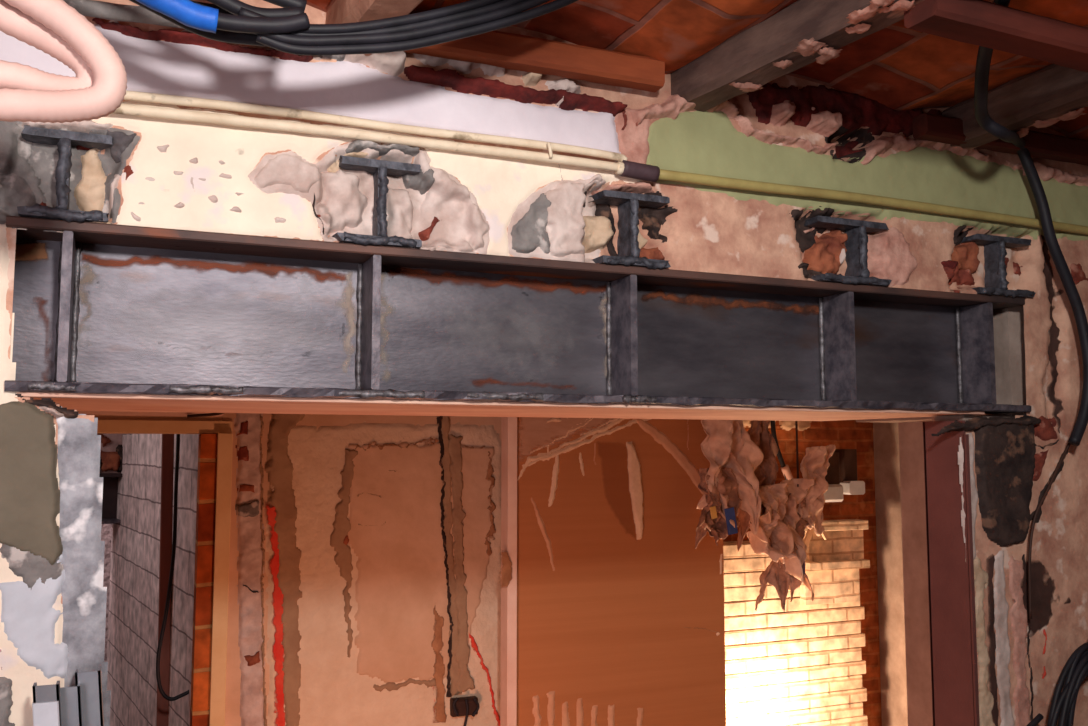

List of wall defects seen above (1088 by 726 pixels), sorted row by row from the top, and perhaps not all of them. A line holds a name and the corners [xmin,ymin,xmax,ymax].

flaking render [92,17,990,165]
spalling [0,120,155,232]
rust [79,253,355,366]
spalling [248,140,490,254]
rust [381,267,606,331]
spalling [507,165,614,263]
spalling [789,206,848,279]
peeling [867,227,918,287]
spalling [941,225,980,293]
crack [1030,235,1088,523]
peeling [958,433,1034,726]
leakage [1015,561,1055,679]